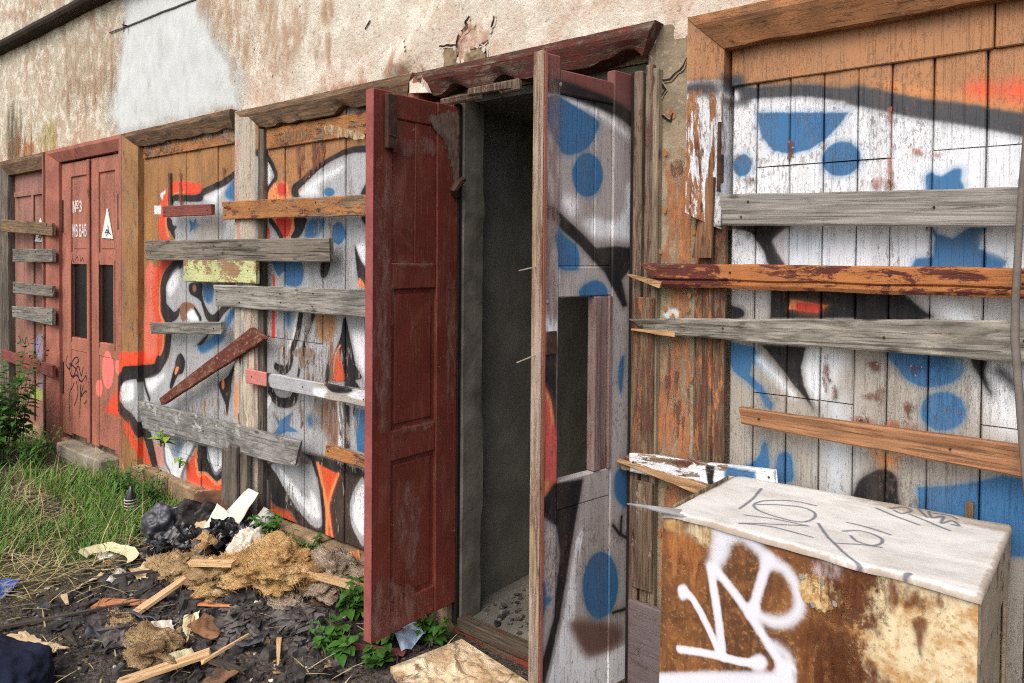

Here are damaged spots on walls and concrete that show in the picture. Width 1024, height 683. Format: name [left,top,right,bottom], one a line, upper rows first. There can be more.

flaking render [440,21,492,67]
damp [4,103,21,160]